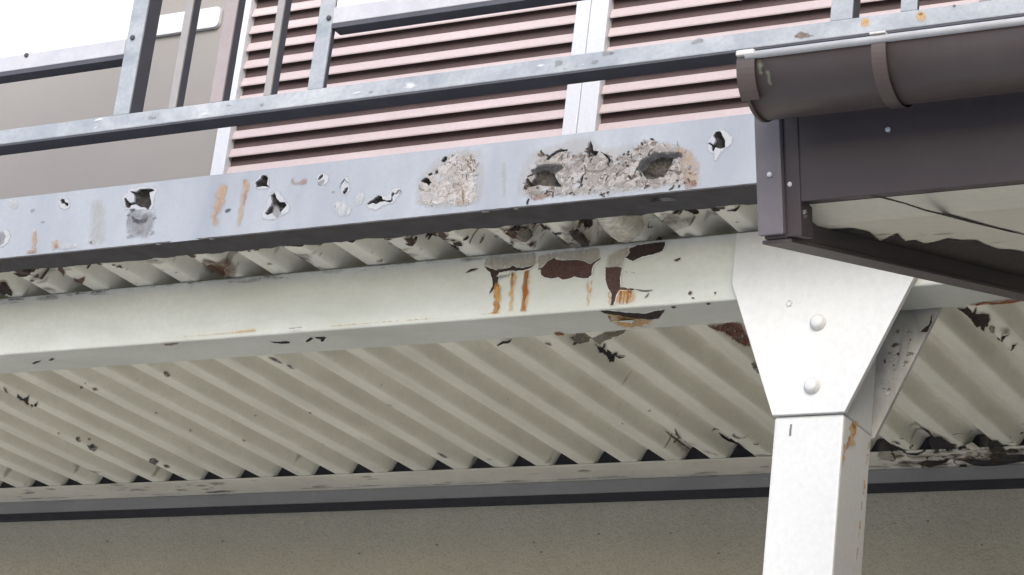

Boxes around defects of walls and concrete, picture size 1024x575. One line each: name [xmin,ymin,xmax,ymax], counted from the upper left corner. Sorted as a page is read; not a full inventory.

spalling [126,189,154,224]
corrosion [212,180,249,223]
spalling [257,176,286,215]
peeling [334,188,394,216]
spalling [418,150,479,208]
spalling [524,138,696,205]
peeling [483,219,677,346]
peeling [956,306,1017,352]
spalling [884,427,1024,468]